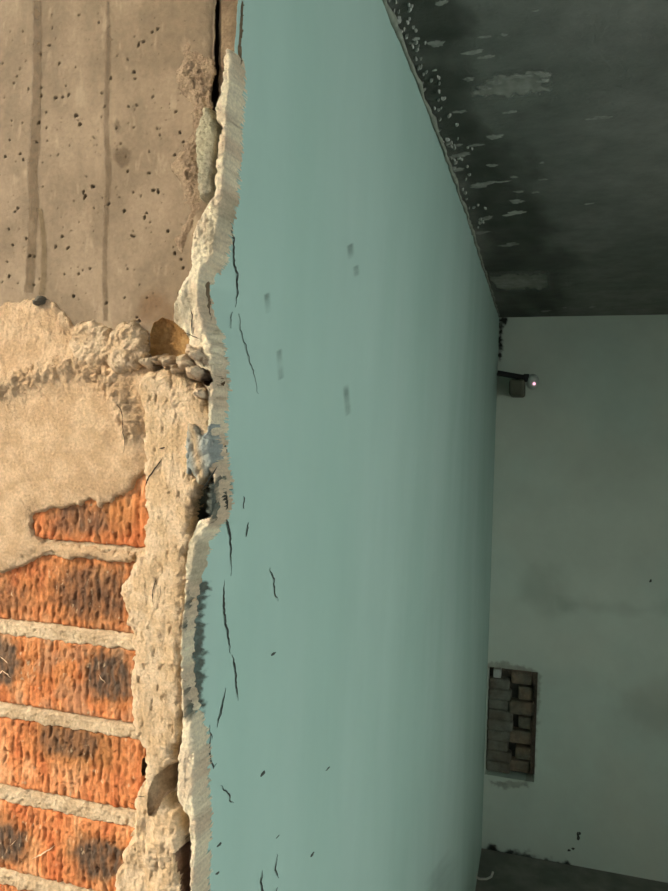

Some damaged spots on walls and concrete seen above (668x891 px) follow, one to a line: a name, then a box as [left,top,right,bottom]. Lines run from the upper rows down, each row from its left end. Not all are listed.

leakage [24,1,46,292]
flaking render [0,42,248,891]